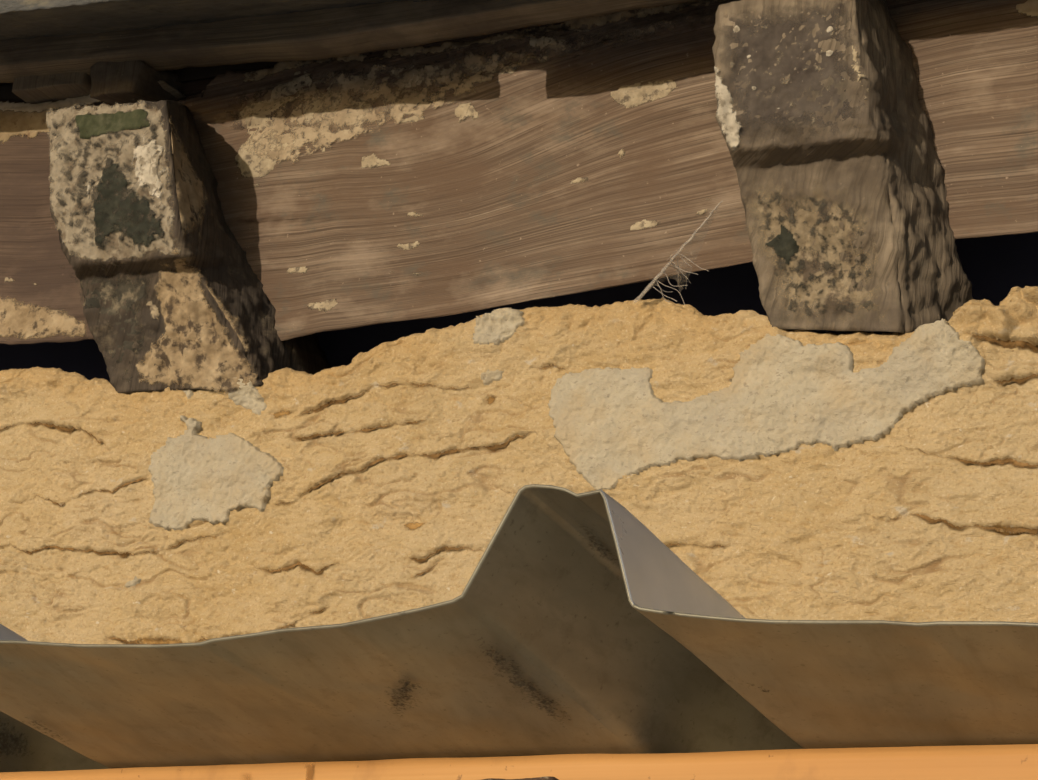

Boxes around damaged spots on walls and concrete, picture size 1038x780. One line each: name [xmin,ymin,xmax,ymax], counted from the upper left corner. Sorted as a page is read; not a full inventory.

leakage [51,112,168,251]
leakage [758,192,873,316]
leakage [80,275,147,372]
crack [297,383,464,441]
crack [0,422,103,443]
crack [280,435,524,504]
crack [956,458,1038,468]
crack [48,478,145,507]
crack [915,514,1038,535]
crack [24,536,207,558]
crack [266,562,334,574]
crack [411,546,465,576]